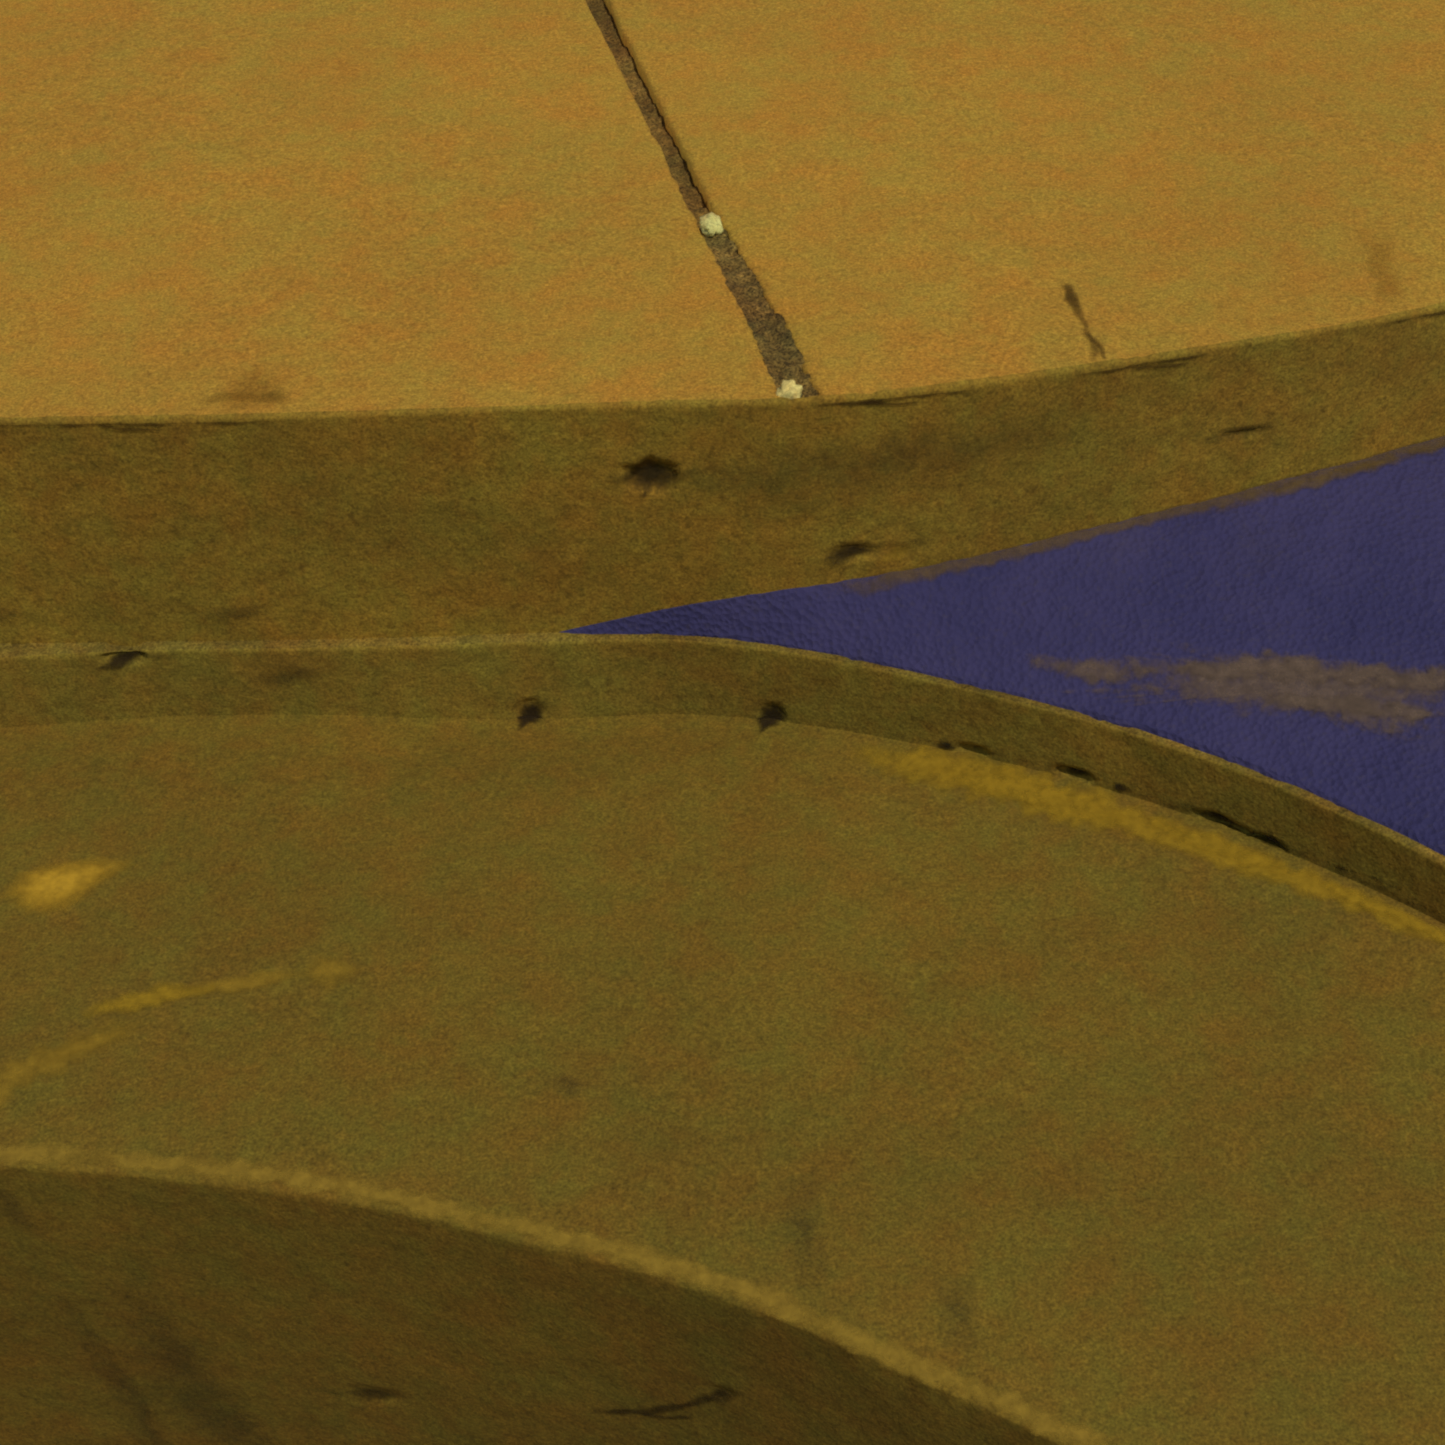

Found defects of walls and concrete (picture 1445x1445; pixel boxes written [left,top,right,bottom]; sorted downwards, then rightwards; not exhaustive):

spalling [629,463,671,487]